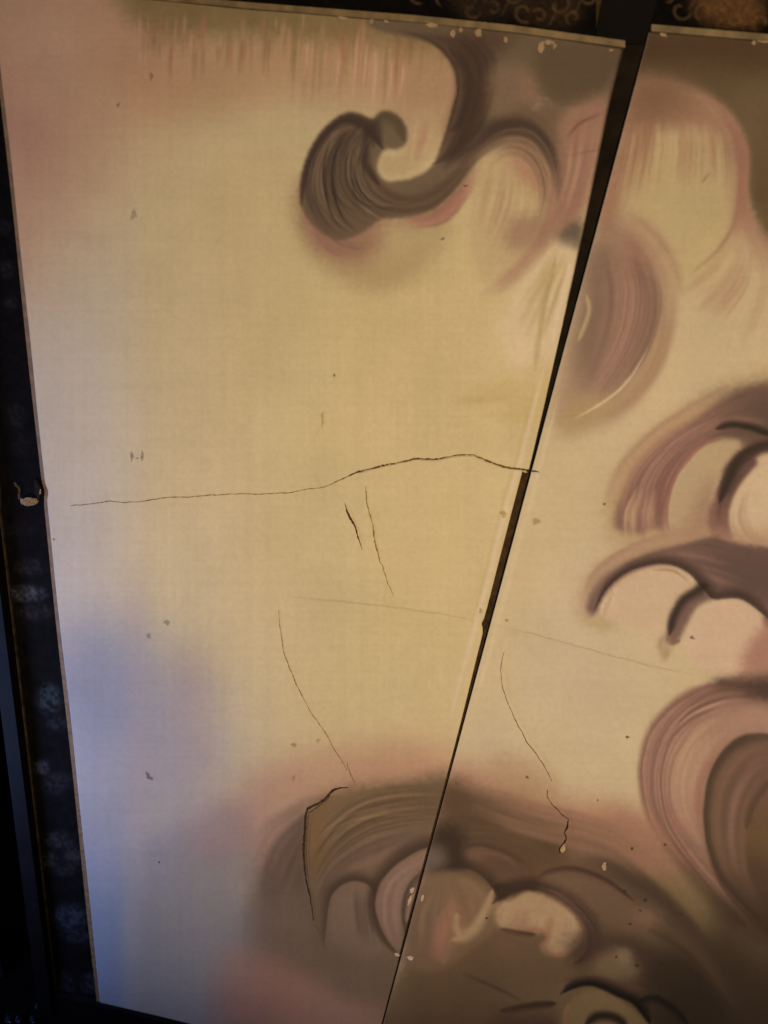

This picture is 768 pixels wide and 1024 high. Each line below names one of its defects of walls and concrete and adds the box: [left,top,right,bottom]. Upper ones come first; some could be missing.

peeling [538,40,557,54]
crack [71,454,540,597]
crack [278,609,356,785]
crack [501,654,569,853]